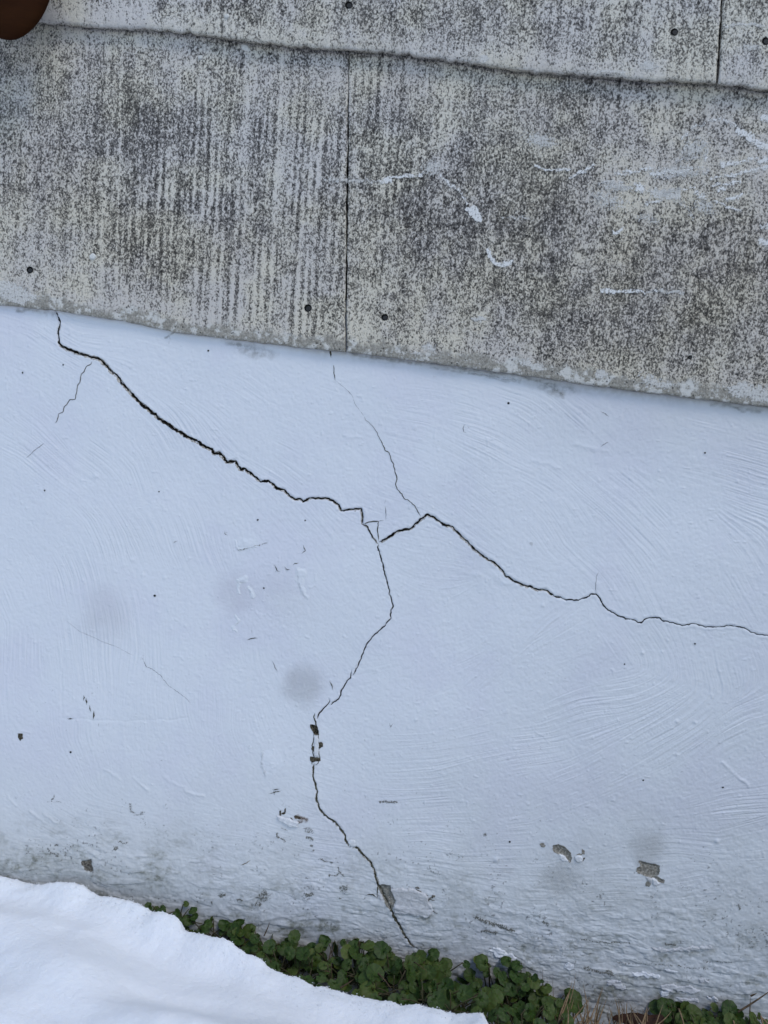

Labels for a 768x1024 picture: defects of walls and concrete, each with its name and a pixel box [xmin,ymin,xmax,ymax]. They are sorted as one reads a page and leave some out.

crack [55,312,768,948]
peeling [277,808,308,827]
spalling [540,843,572,863]
spalling [636,860,665,887]